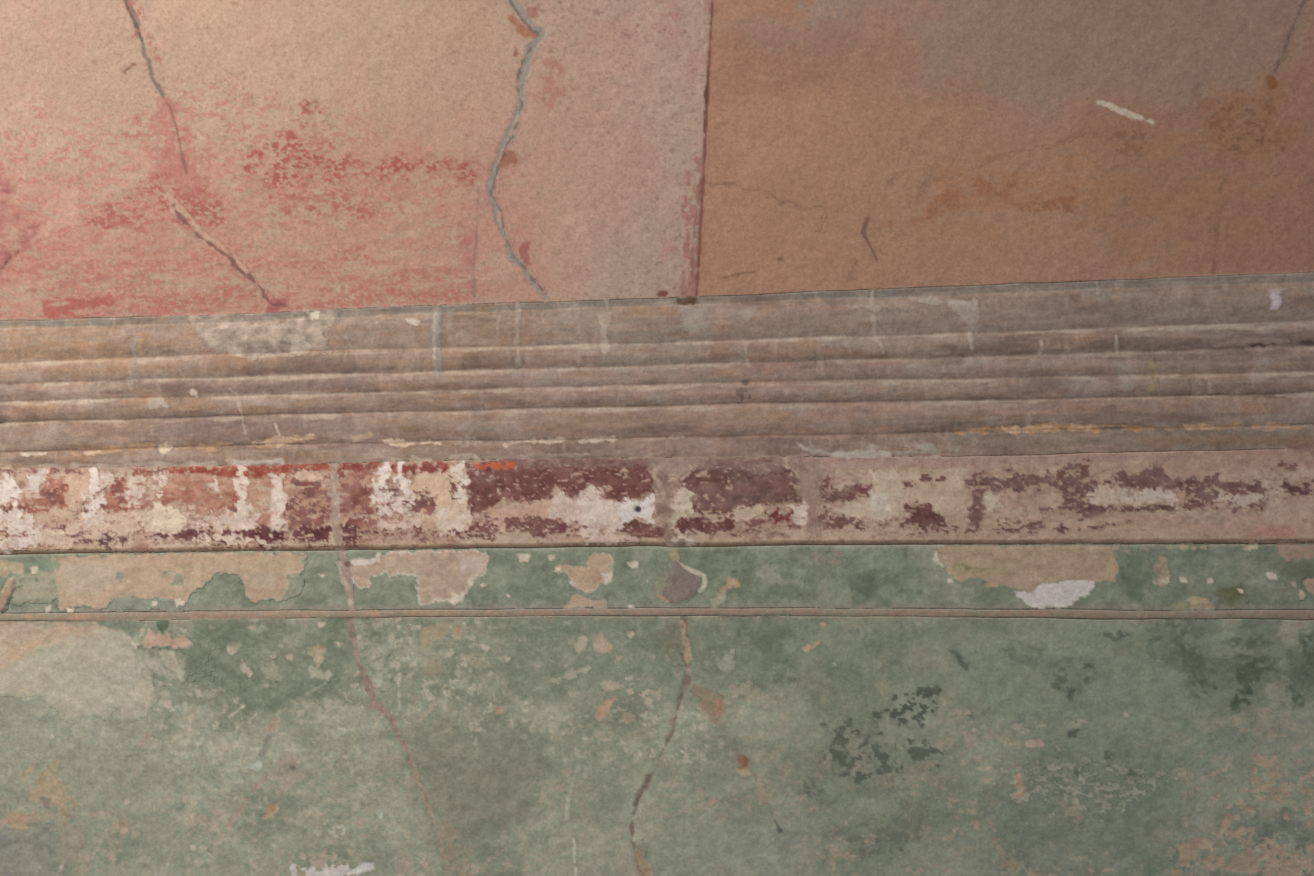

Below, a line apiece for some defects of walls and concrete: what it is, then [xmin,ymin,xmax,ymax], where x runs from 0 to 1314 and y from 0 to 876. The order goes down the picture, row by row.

crack [1270,0,1310,78]
crack [123,0,288,310]
crack [470,0,549,302]
spalling [951,420,1314,438]
flaking render [0,430,1314,740]
peeling [289,822,376,876]
crack [627,616,793,846]
peeling [991,716,1182,825]
peeling [1175,681,1314,876]